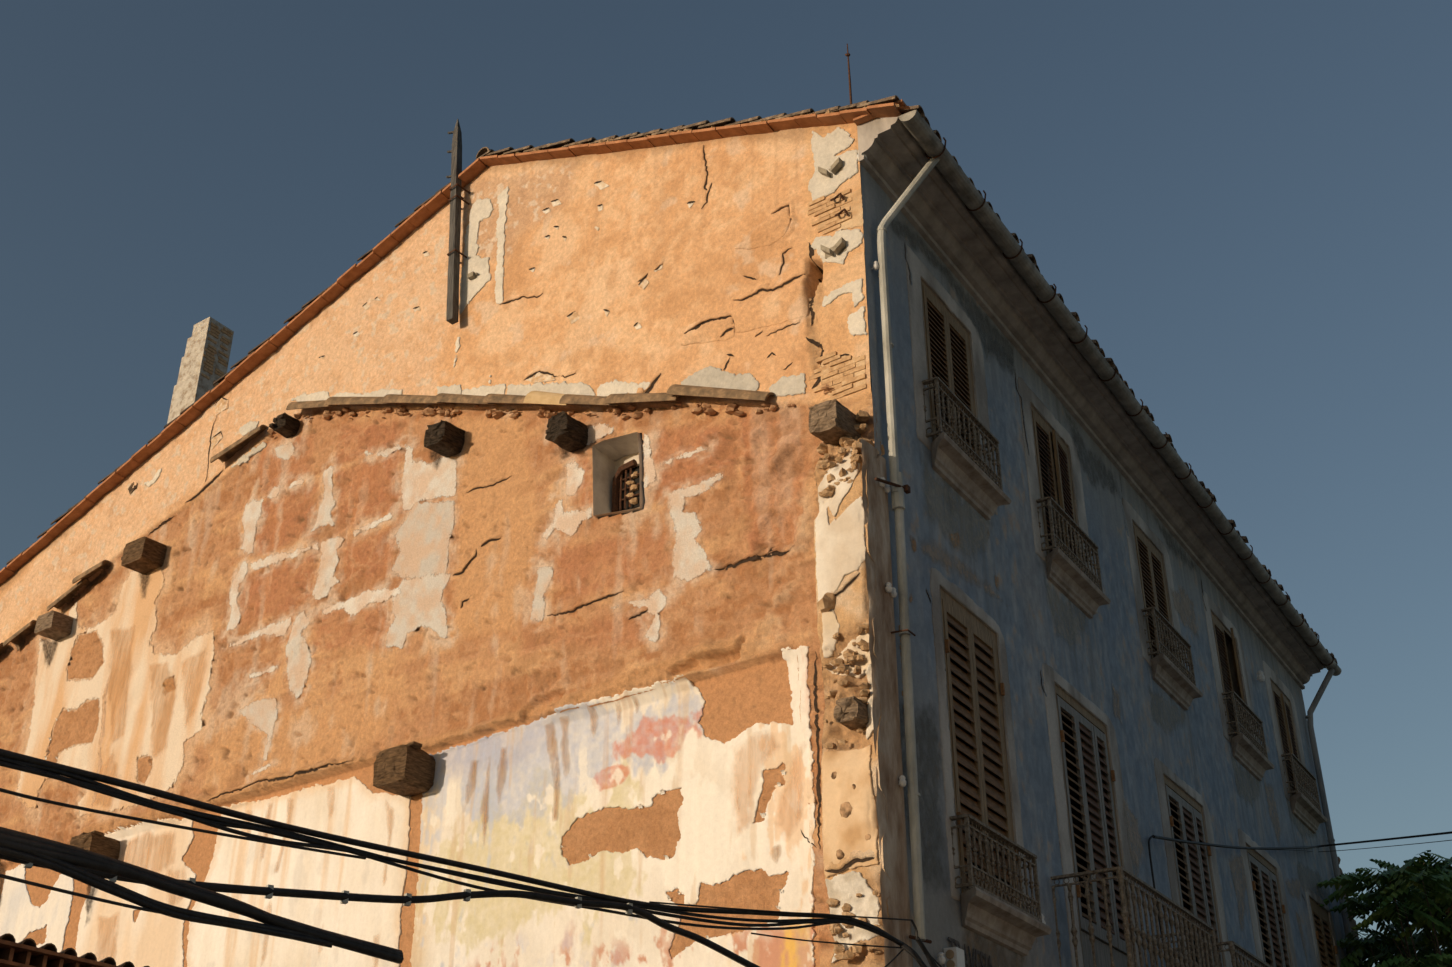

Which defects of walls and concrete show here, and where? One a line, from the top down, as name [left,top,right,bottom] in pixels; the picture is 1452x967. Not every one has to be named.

crack [699,145,712,209]
flaking render [807,188,863,235]
crack [684,200,860,388]
crack [466,474,512,493]
crack [453,533,501,608]
crack [714,542,794,570]
crack [547,588,648,620]
flaking render [45,700,99,763]
flaking render [756,763,785,822]
flaking render [560,789,683,865]
flaking render [666,869,789,959]
spalling [825,849,881,963]